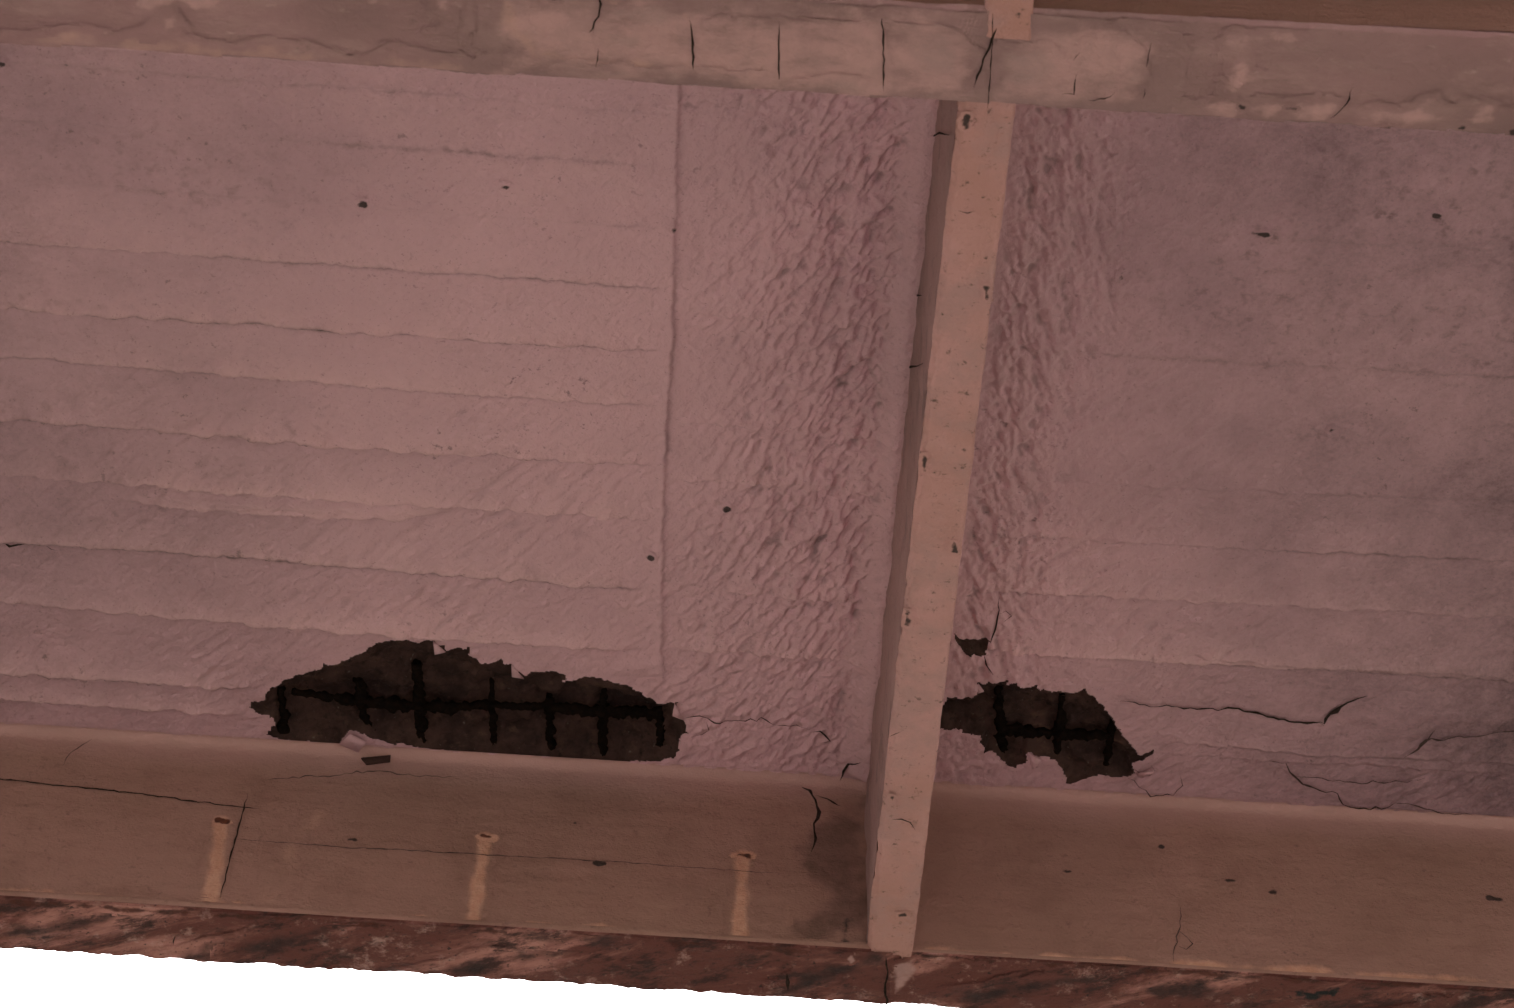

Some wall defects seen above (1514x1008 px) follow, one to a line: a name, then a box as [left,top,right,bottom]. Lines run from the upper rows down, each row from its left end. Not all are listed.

crack [590,0,602,68]
crack [974,17,997,110]
spalling [249,640,688,765]
crack [687,715,859,852]
spalling [940,680,1154,784]
crack [1128,769,1183,797]
crack [1126,696,1366,726]
crack [1272,729,1514,815]